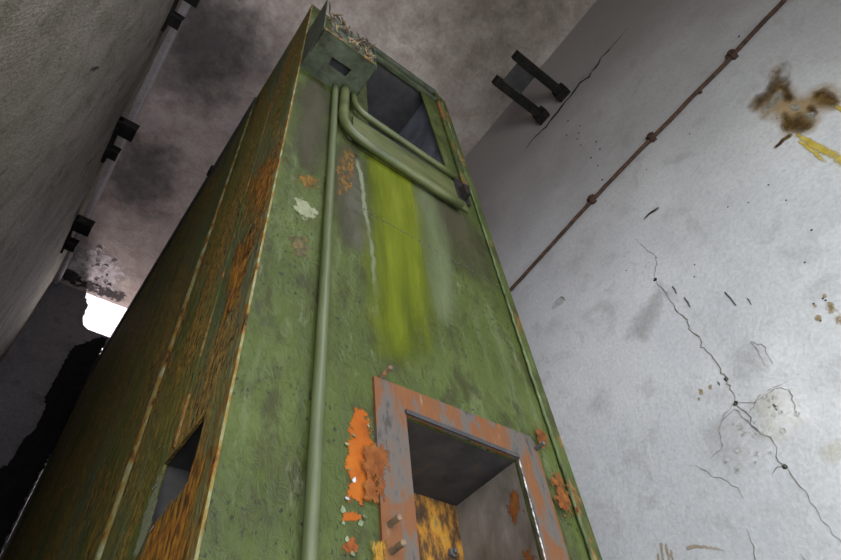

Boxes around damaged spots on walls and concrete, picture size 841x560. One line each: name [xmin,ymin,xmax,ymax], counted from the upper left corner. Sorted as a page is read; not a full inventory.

rust [755,71,841,164]
crack [636,239,841,541]